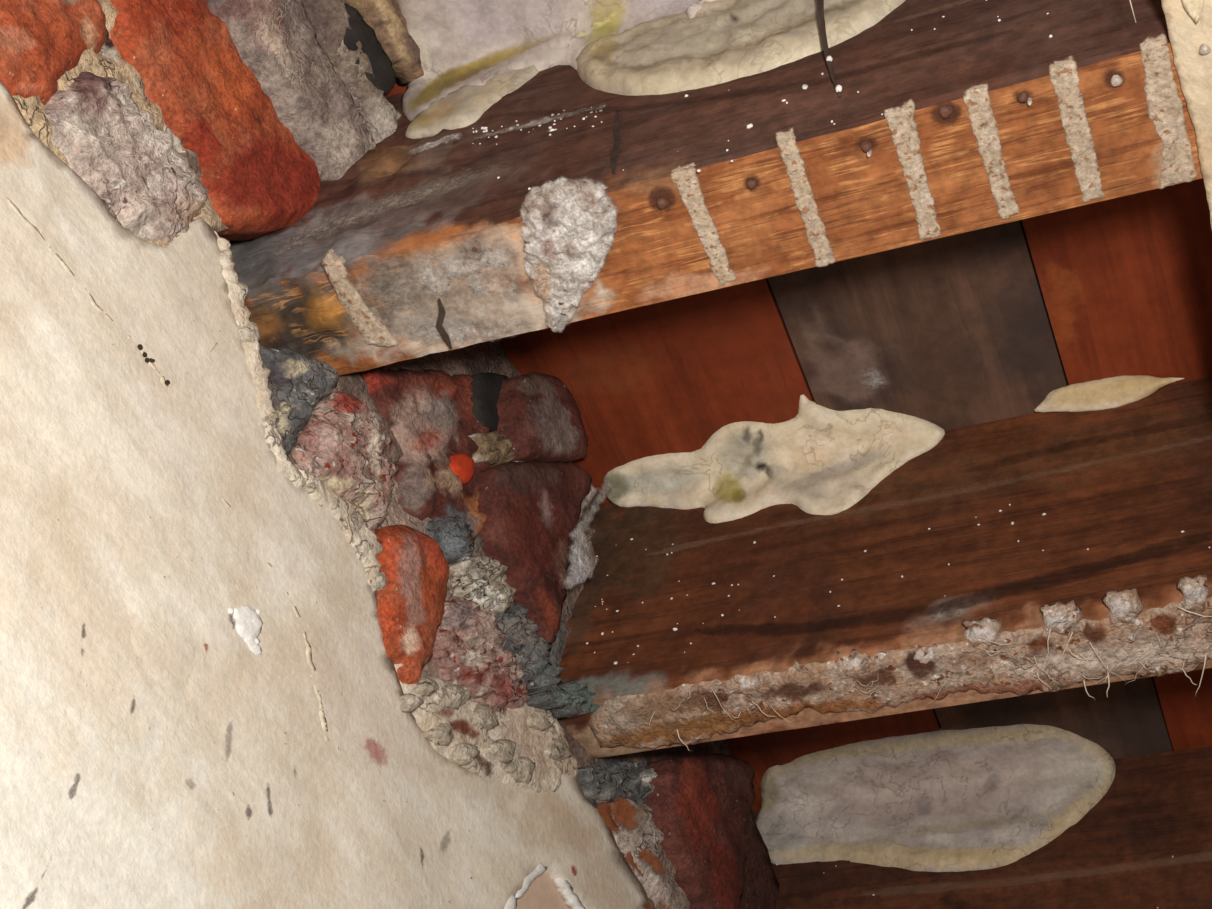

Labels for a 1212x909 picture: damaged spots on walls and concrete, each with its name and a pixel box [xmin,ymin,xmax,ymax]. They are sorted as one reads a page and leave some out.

damp [414,247,518,298]
damp [407,320,532,343]
spalling [0,0,755,909]